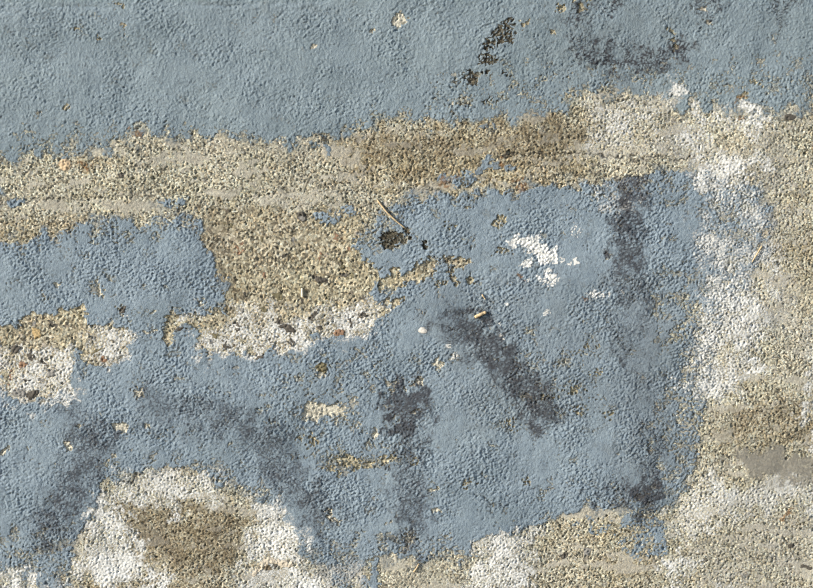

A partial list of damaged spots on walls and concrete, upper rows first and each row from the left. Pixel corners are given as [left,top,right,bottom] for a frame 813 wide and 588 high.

spalling [453,17,530,87]
leakage [561,0,696,106]
peeling [142,197,475,359]
peeling [521,257,559,287]
leakage [586,96,797,403]
leakage [0,344,87,412]
peeling [0,290,131,404]
leakage [0,421,224,588]
leakage [233,464,362,588]
peeling [295,396,361,450]
peeling [321,450,397,478]
leakage [446,308,558,436]